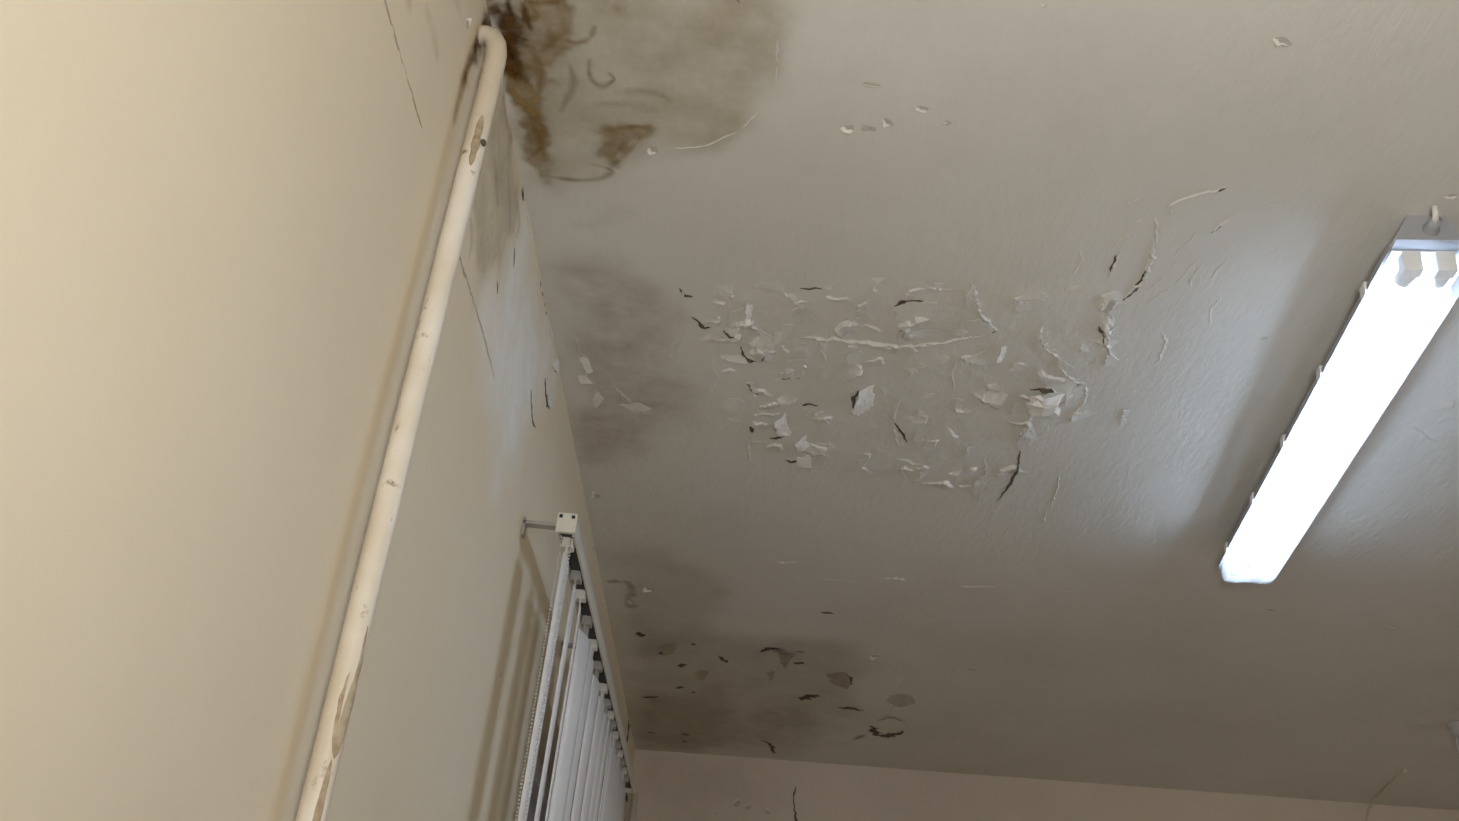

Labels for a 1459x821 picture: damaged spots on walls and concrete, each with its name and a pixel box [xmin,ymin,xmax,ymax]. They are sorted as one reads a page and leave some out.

peeling [664,185,1244,523]
crack [791,786,799,821]